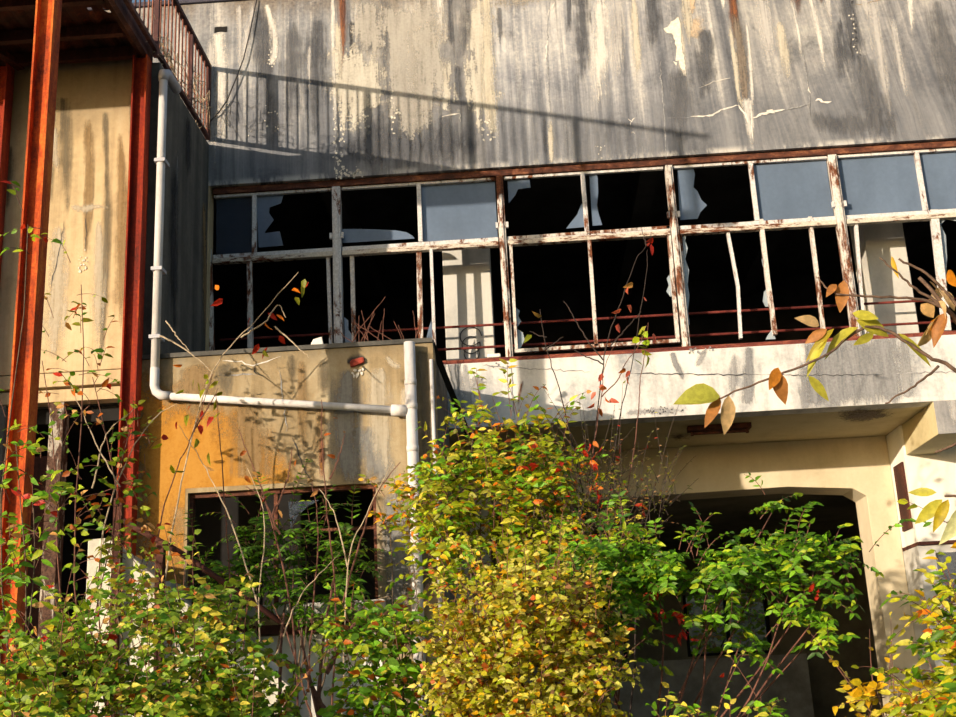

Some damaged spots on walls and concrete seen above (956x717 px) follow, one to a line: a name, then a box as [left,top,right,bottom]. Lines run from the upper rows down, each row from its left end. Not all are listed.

water stain [208,34,227,145]
water stain [237,0,337,134]
rust [335,0,345,79]
water stain [567,0,659,99]
peeling [664,0,702,76]
rust [729,0,748,101]
crack [674,49,831,138]
water stain [730,0,801,139]
rust [83,124,94,245]
water stain [67,114,110,348]
rust [115,139,127,314]
spalling [347,356,365,378]